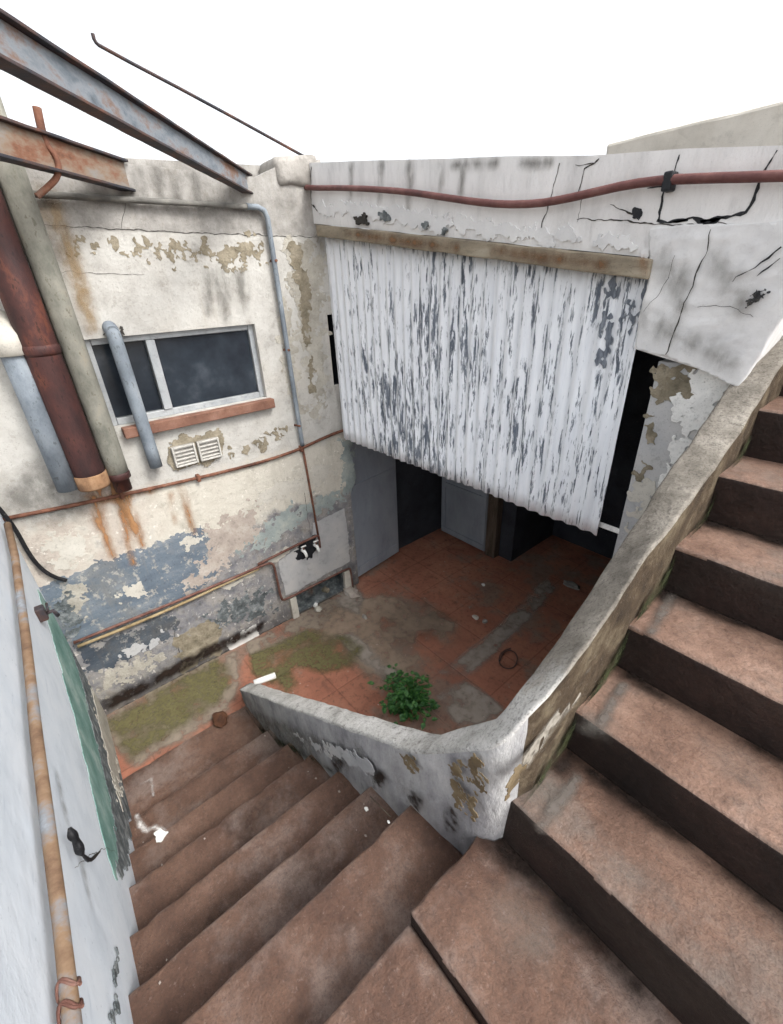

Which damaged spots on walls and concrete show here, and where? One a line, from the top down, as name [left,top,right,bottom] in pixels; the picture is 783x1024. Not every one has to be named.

peeling [66,230,270,274]
crack [541,150,782,355]
flaking render [274,199,650,420]
peeling [227,425,288,459]
peeling [624,363,730,533]
peeling [40,520,99,572]
corrosion [88,482,152,557]
spalling [53,583,89,640]
peeling [114,581,148,604]
peeling [399,753,420,774]
peeling [445,753,489,832]
peeling [504,693,581,801]